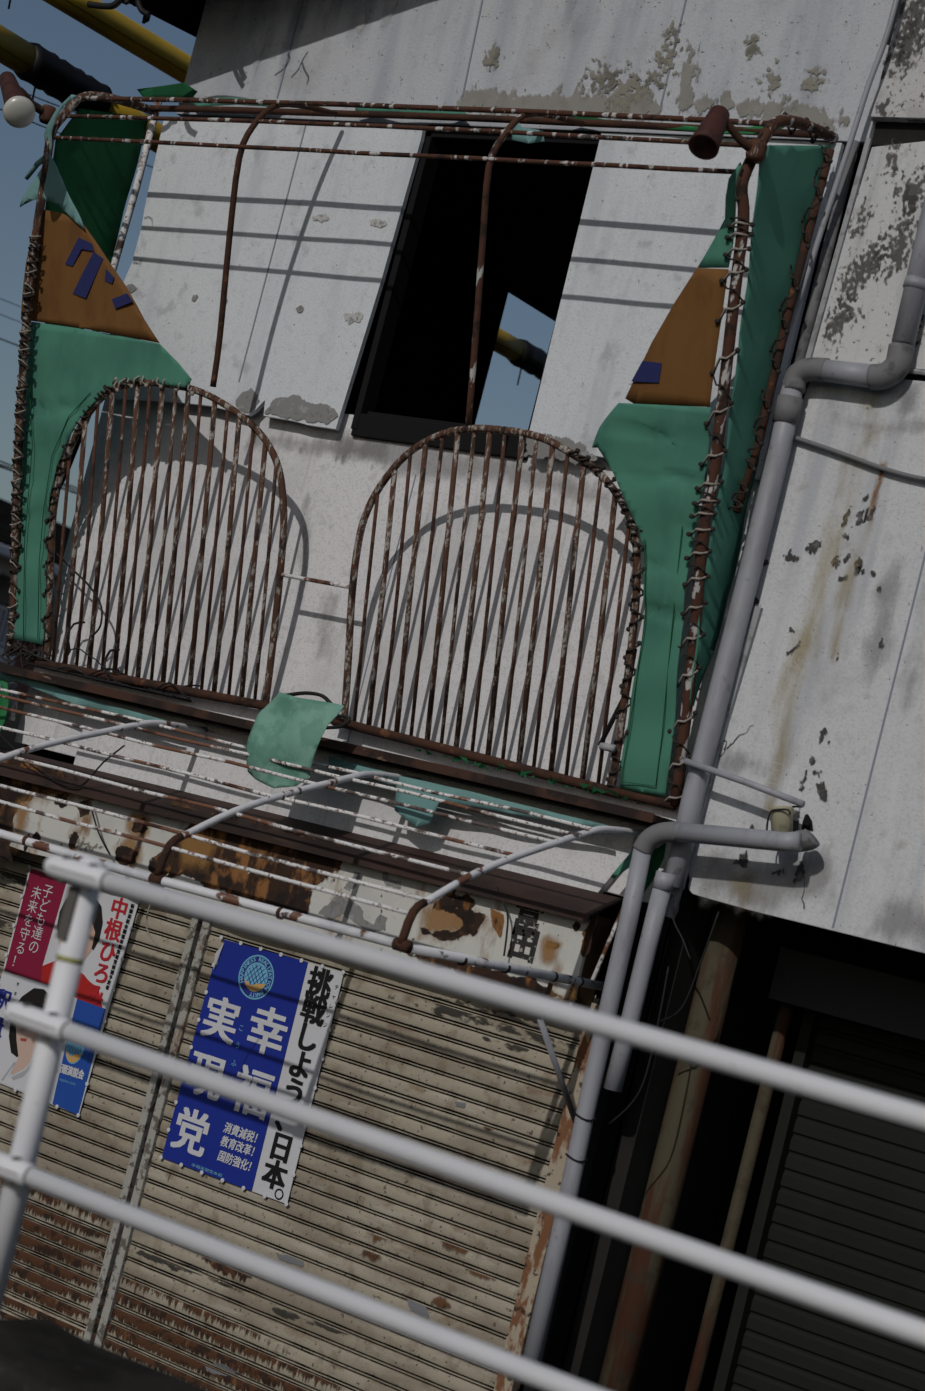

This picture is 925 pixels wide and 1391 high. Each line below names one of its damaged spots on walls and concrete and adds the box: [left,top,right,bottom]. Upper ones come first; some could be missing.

peeling [456,17,850,131]
leakage [882,0,925,85]
peeling [822,141,925,350]
peeling [763,540,822,566]
peeling [831,494,881,593]
corrosion [0,751,92,862]
peeling [793,728,830,832]
corrosion [115,803,342,914]
corrosion [421,890,504,941]
corrosion [408,953,577,1003]
corrosion [542,937,559,962]
corrosion [572,913,599,957]